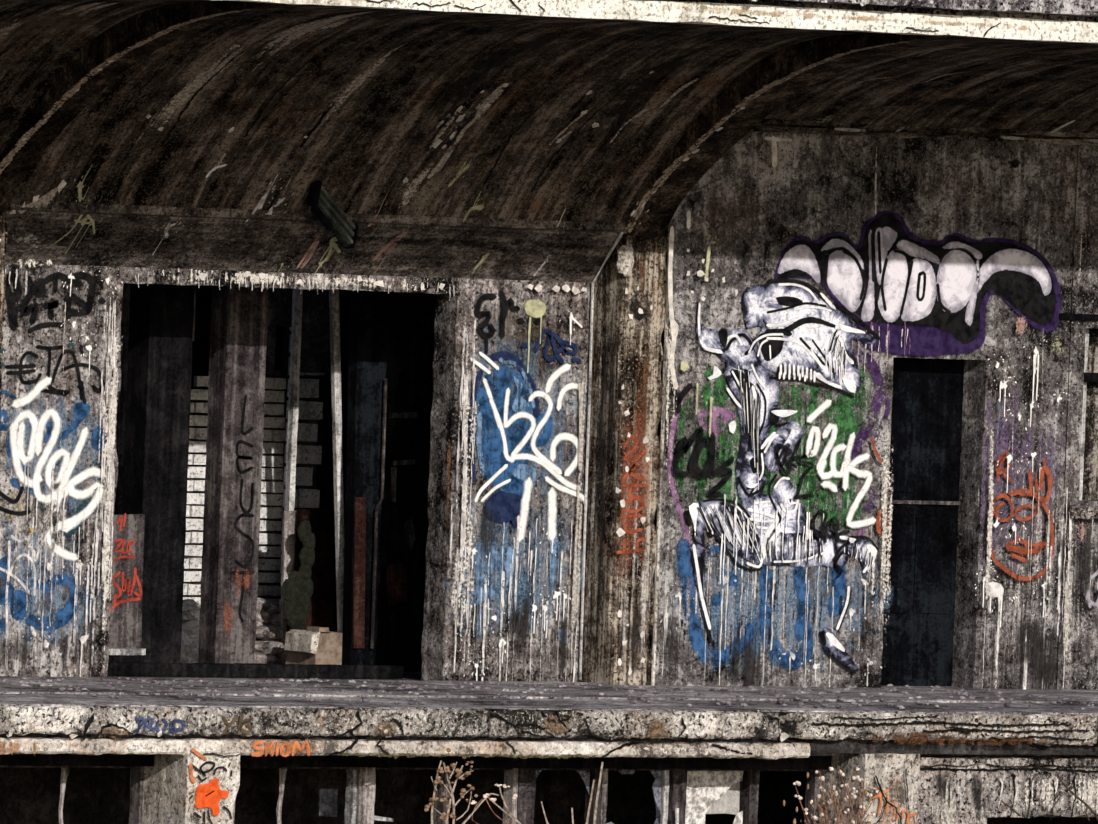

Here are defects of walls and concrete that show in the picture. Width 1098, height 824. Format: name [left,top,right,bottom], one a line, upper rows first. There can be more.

damp [765,136,792,168]
damp [589,309,616,639]
crack [329,711,389,756]
crack [490,710,753,757]